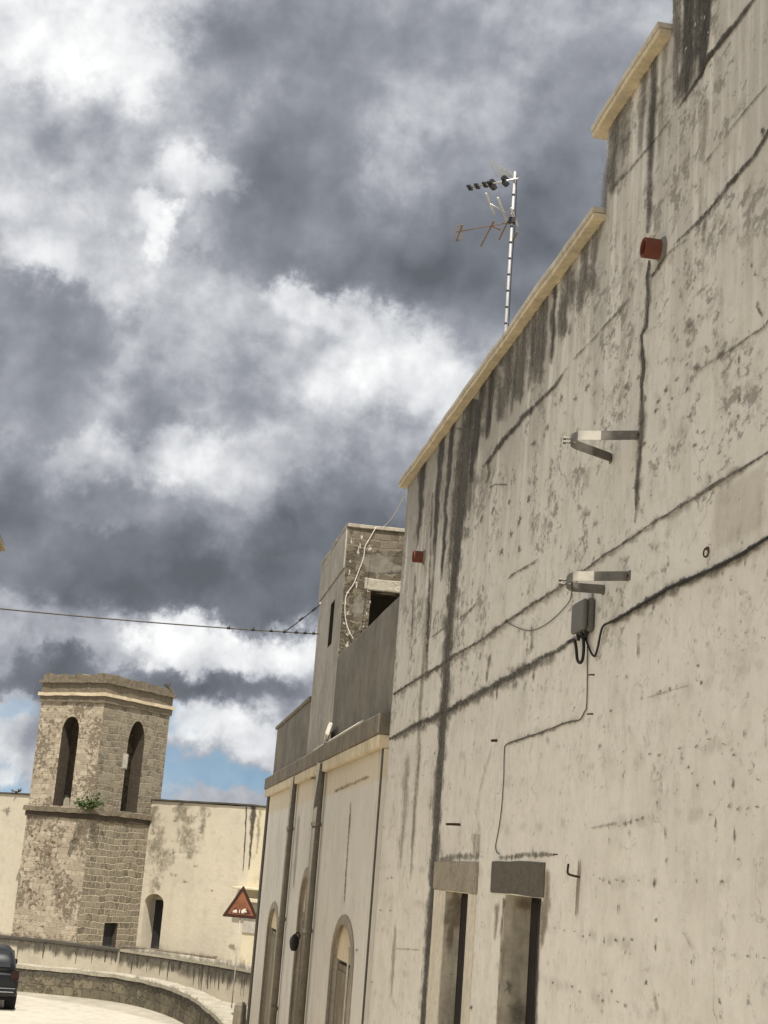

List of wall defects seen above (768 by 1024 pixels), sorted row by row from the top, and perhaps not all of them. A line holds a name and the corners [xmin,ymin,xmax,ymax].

water stain [411,57,662,1024]
crack [389,86,768,740]
crack [609,0,754,191]
water stain [672,0,711,101]